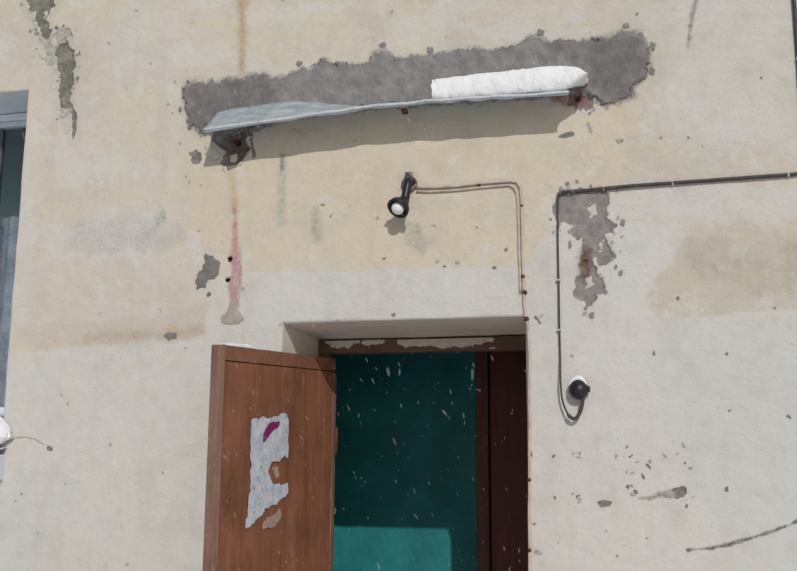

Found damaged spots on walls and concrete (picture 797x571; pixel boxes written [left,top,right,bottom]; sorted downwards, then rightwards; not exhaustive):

flaking render [20,0,80,140]
flaking render [556,90,596,133]
flaking render [549,179,625,319]
flaking render [647,486,694,508]